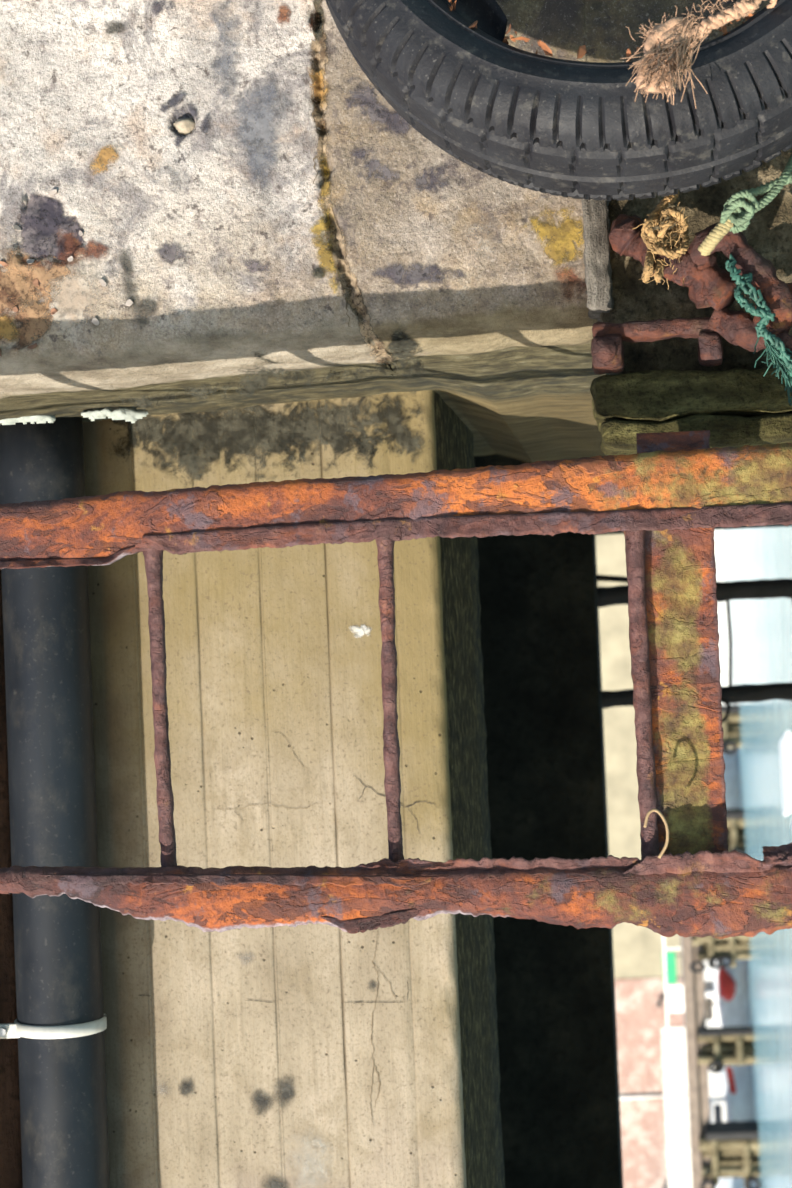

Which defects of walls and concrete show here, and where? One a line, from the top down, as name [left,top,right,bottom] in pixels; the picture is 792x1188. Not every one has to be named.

crack [311,1,397,378]
corrosion [22,233,108,266]
water stain [112,330,424,485]
crack [346,929,409,1116]
water stain [180,1082,193,1096]
water stain [253,1079,294,1114]
water stain [265,1178,288,1188]